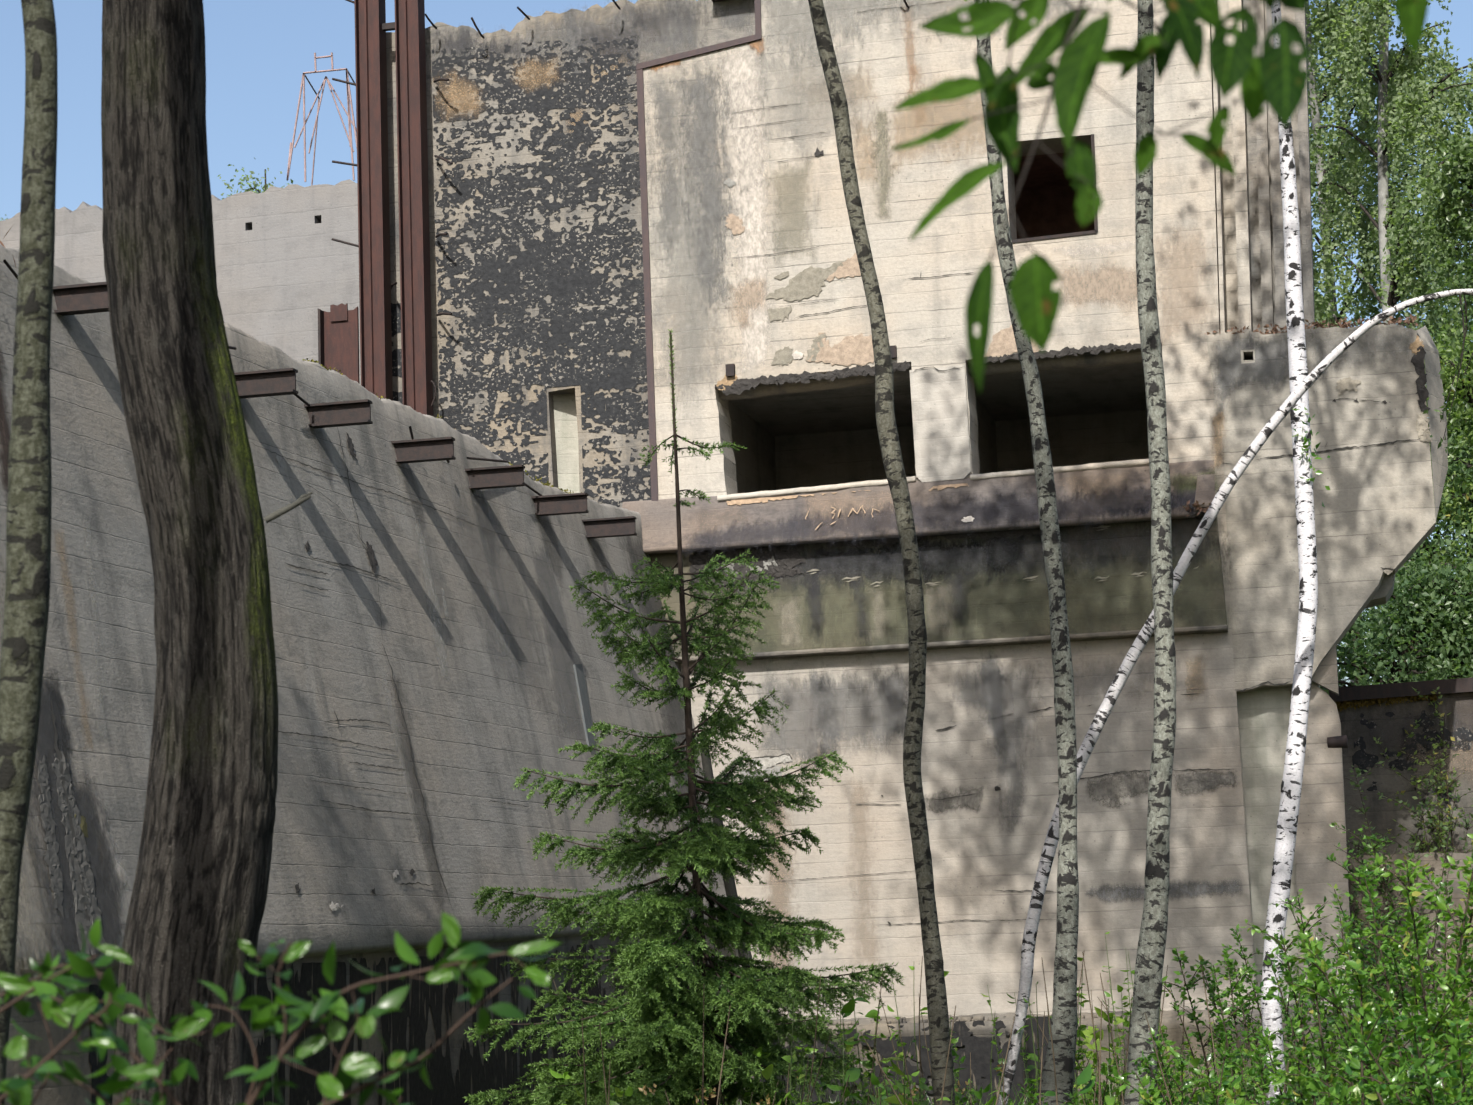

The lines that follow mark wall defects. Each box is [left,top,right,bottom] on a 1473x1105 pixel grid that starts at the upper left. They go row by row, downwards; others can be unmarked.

peeling [432,17,651,507]
damp [689,50,770,371]
peeling [736,253,861,326]
spalling [1409,336,1432,442]
damp [982,657,1005,750]
peeling [1352,710,1473,806]
damp [29,675,126,969]